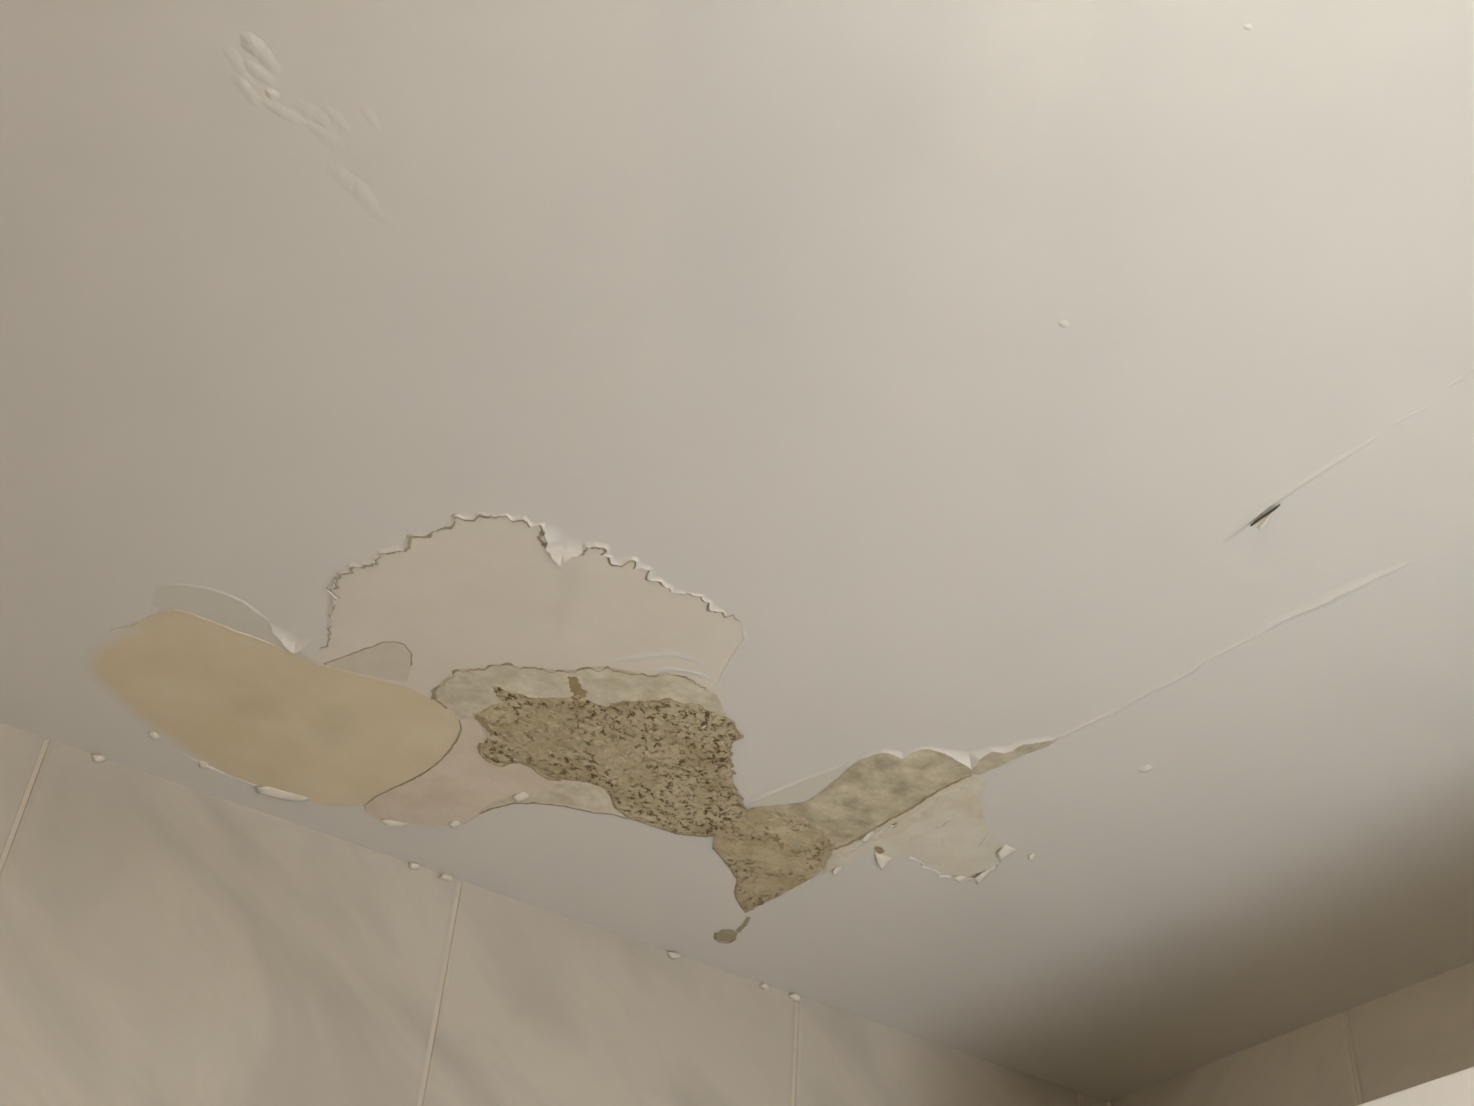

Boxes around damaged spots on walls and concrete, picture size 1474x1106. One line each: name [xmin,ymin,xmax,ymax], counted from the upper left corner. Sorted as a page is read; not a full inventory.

crack [1221,367,1474,544]
damp [79,582,459,806]
peeling [312,511,1061,913]